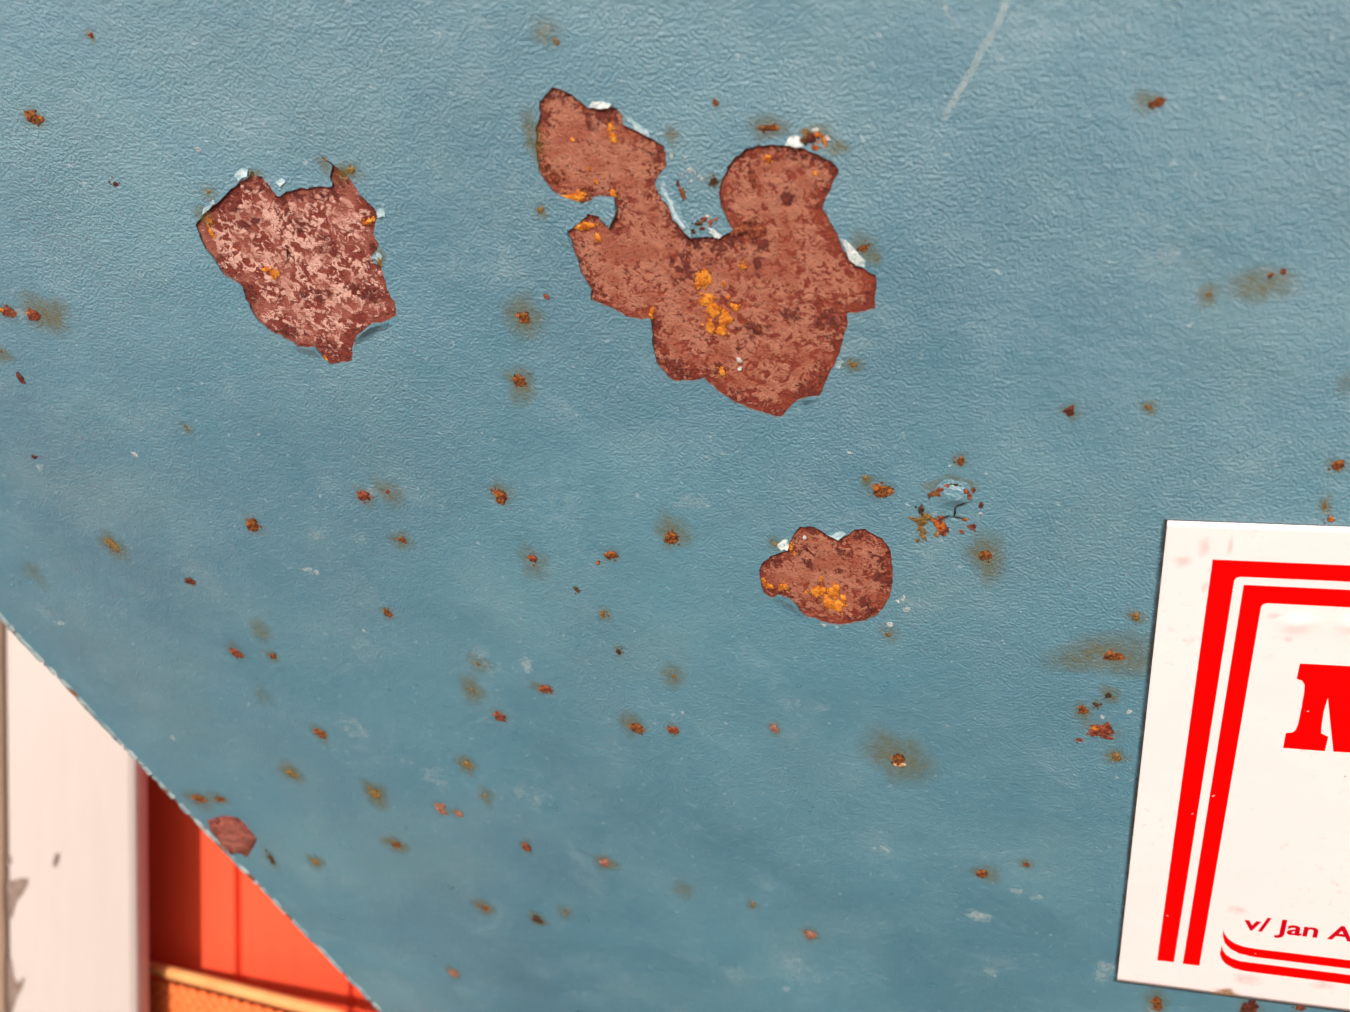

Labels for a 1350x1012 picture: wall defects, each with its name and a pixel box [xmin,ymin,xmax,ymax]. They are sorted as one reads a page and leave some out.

corrosion [533,87,877,417]
spalling [0,613,383,1012]
corrosion [887,753,914,768]
corrosion [1074,693,1122,762]